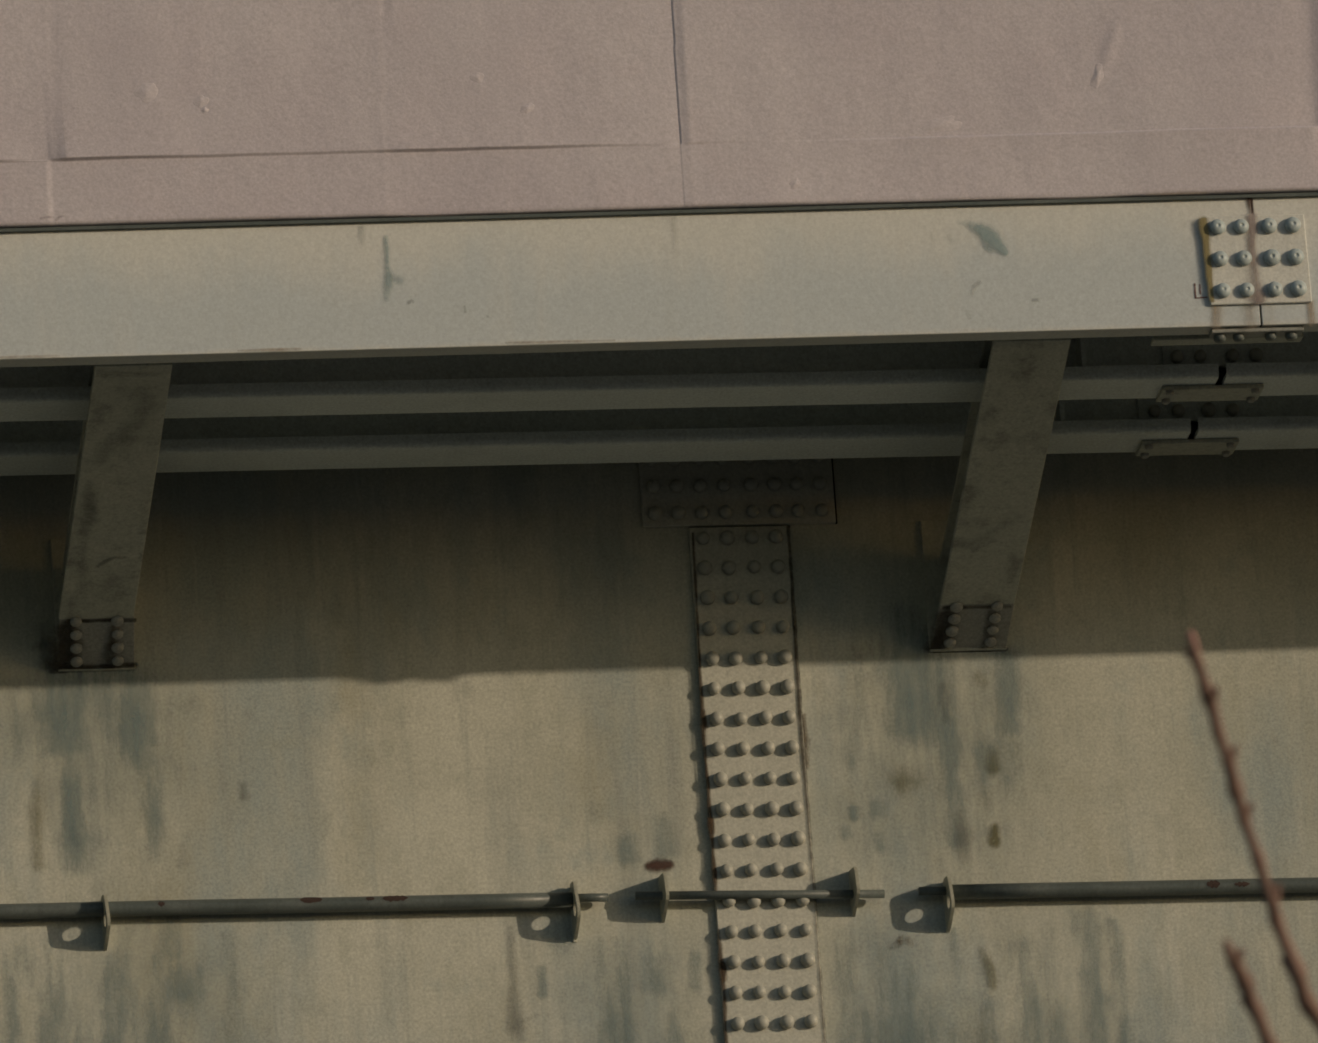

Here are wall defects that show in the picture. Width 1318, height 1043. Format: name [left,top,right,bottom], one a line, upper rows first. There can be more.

corrosion [646,859,674,871]